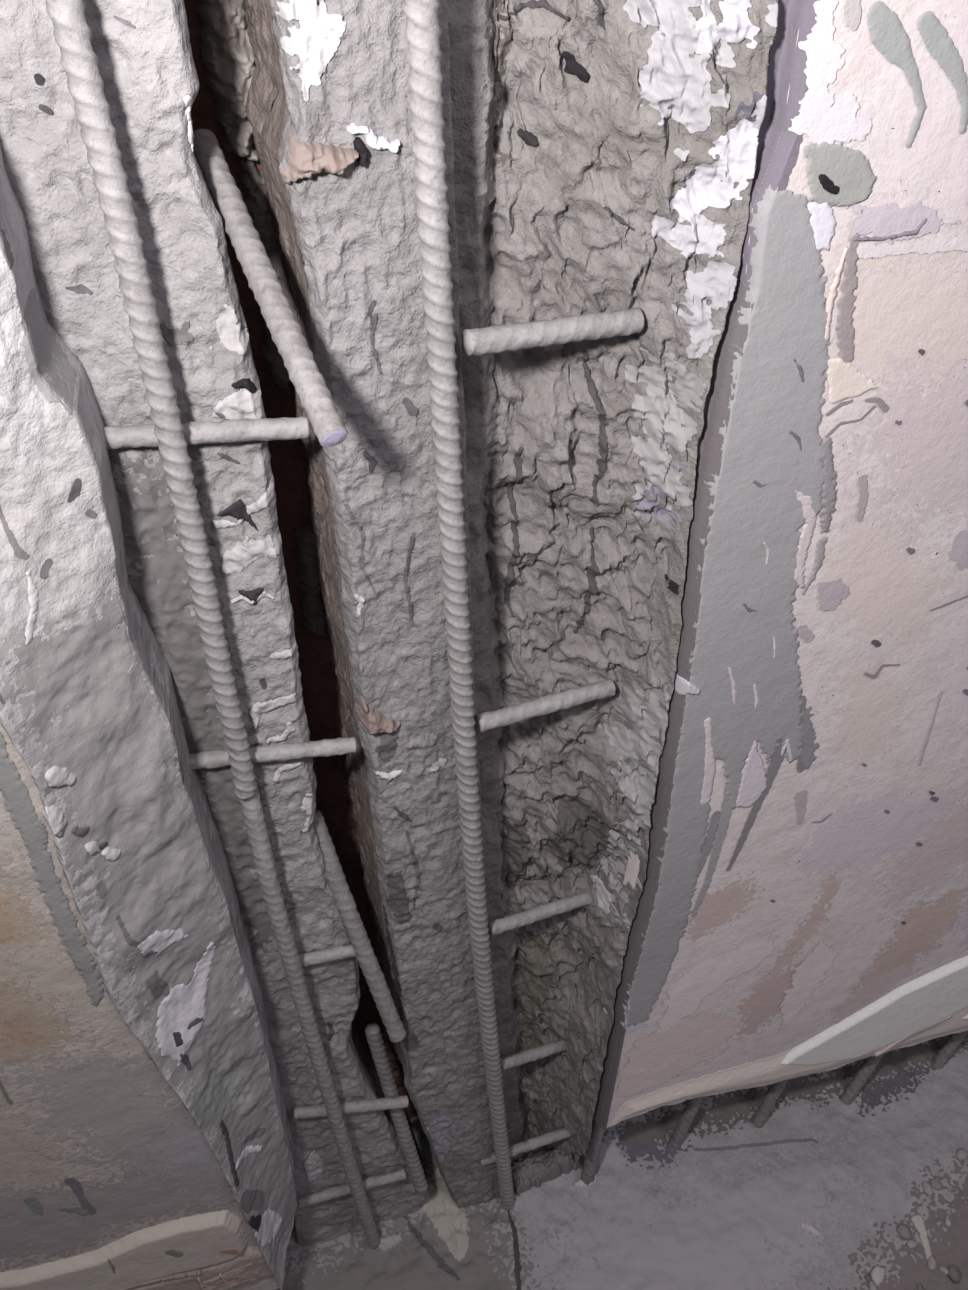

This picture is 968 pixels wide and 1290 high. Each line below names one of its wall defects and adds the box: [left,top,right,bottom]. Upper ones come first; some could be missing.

spalling [276,0,346,101]
spalling [562,51,590,83]
spalling [183,96,194,152]
spalling [347,123,401,167]
spalling [517,128,539,147]
spalling [622,0,778,530]
spalling [209,304,249,355]
spalling [212,378,265,420]
spalling [213,480,282,574]
spalling [230,588,275,605]
spalling [590,673,671,928]
peeling [155,942,216,1067]